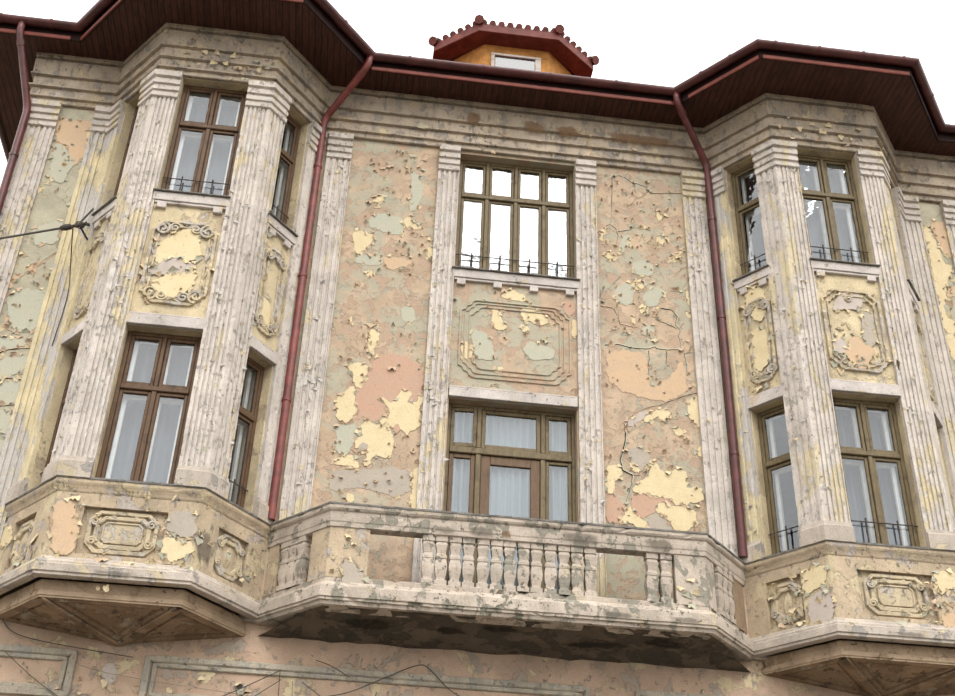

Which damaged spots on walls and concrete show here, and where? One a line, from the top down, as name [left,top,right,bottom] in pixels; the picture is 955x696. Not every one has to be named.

peeling [37,117,92,193]
peeling [95,190,251,304]
peeling [329,316,446,508]
peeling [391,304,417,346]
peeling [460,174,721,532]
crack [600,276,697,506]
peeling [734,262,909,415]
peeling [0,522,13,549]
peeling [11,484,88,567]
peeling [122,495,214,571]
peeling [778,562,837,628]
peeling [919,567,955,628]